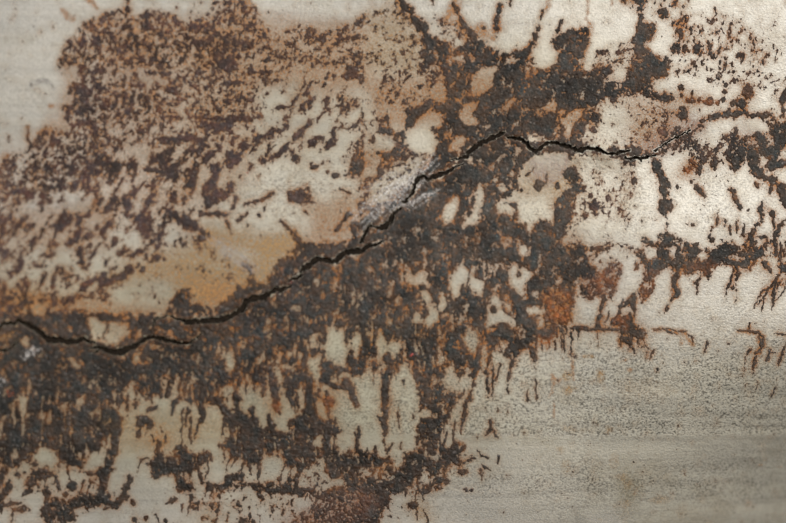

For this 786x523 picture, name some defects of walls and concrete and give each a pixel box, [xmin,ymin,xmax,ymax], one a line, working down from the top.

corrosion [235,191,275,223]
corrosion [690,179,707,199]
corrosion [727,187,750,212]
crack [0,129,691,357]
corrosion [727,321,786,390]